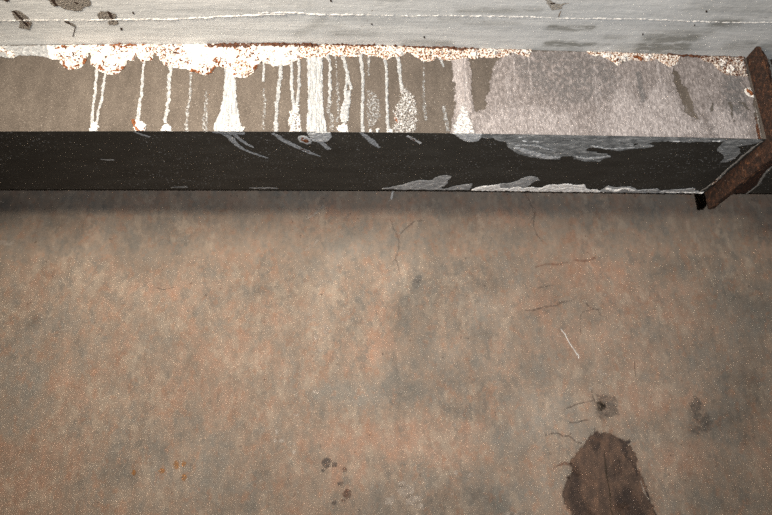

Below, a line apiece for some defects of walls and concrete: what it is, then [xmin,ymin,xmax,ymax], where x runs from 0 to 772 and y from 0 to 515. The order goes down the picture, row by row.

spalling [48,0,91,11]
crack [546,0,569,17]
spalling [11,10,32,30]
spalling [97,11,123,30]
water stain [0,43,763,199]
corrosion [735,163,772,194]
water stain [562,431,656,515]